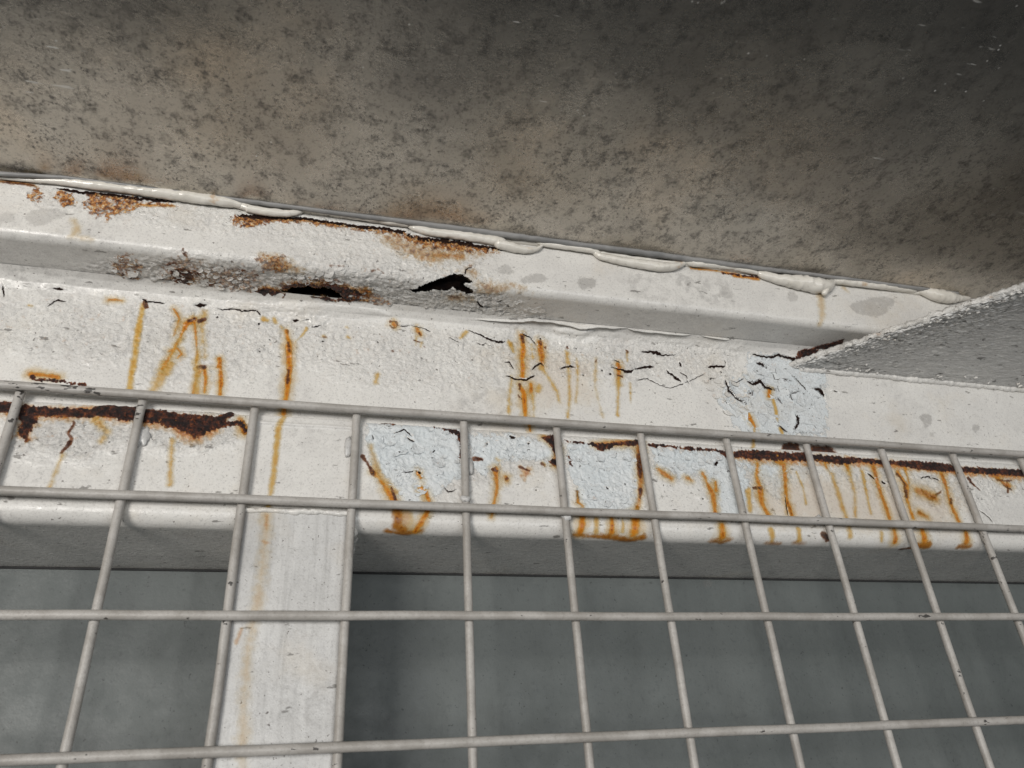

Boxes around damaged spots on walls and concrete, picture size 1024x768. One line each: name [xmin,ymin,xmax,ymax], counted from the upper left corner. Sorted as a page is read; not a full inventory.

rust [0,181,173,221]
rust [230,214,502,259]
spalling [280,268,367,302]
spalling [410,273,728,340]
rust [507,333,578,431]
rust [616,350,631,416]
crack [613,350,837,431]
peeling [704,351,831,437]
rust [796,339,844,359]
rust [360,454,431,535]
peeling [365,423,640,510]
rust [573,491,646,542]